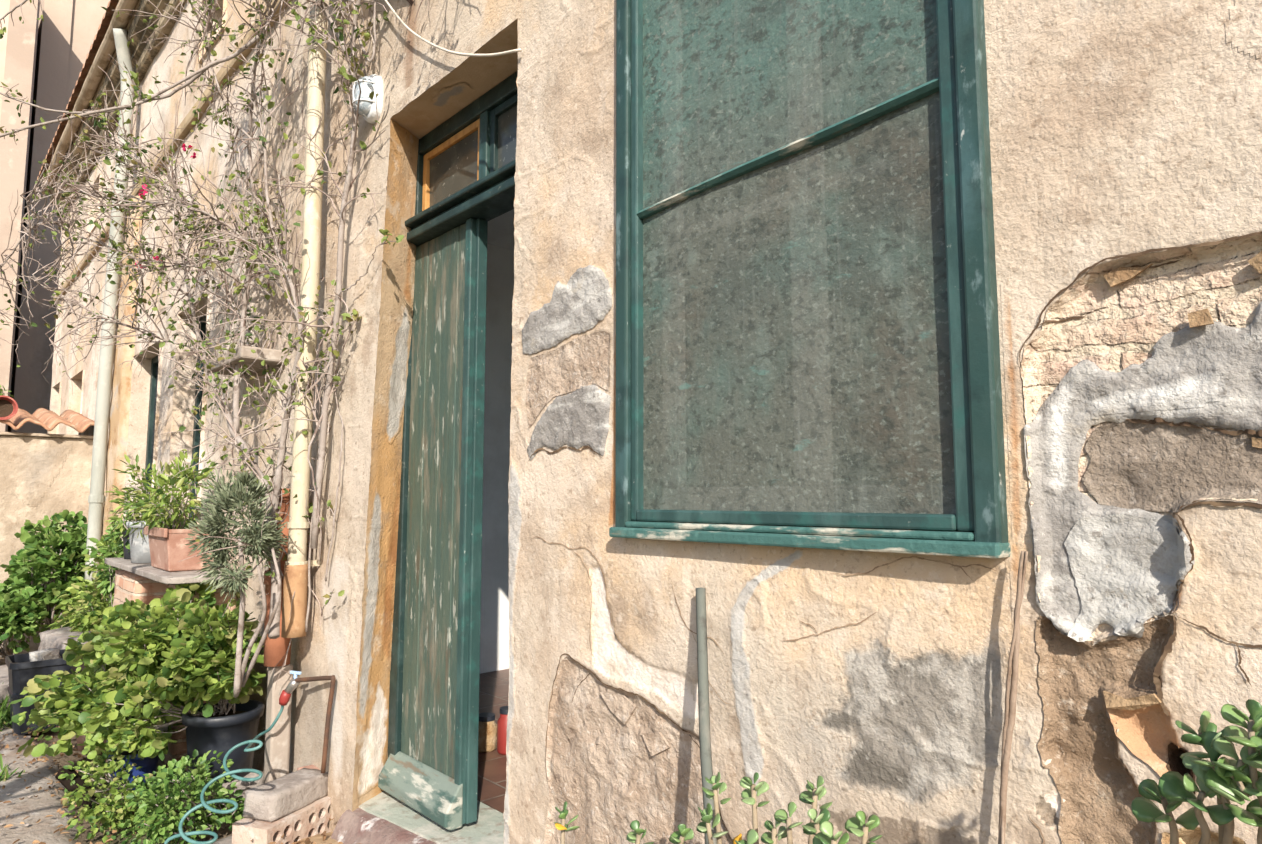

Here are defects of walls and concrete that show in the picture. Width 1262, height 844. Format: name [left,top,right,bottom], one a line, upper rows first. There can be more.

flaking render [525,331,611,428]
flaking render [1020,231,1262,519]
flaking render [1078,419,1262,538]
flaking render [543,657,705,844]
flaking render [720,816,733,844]
flaking render [1035,580,1246,844]